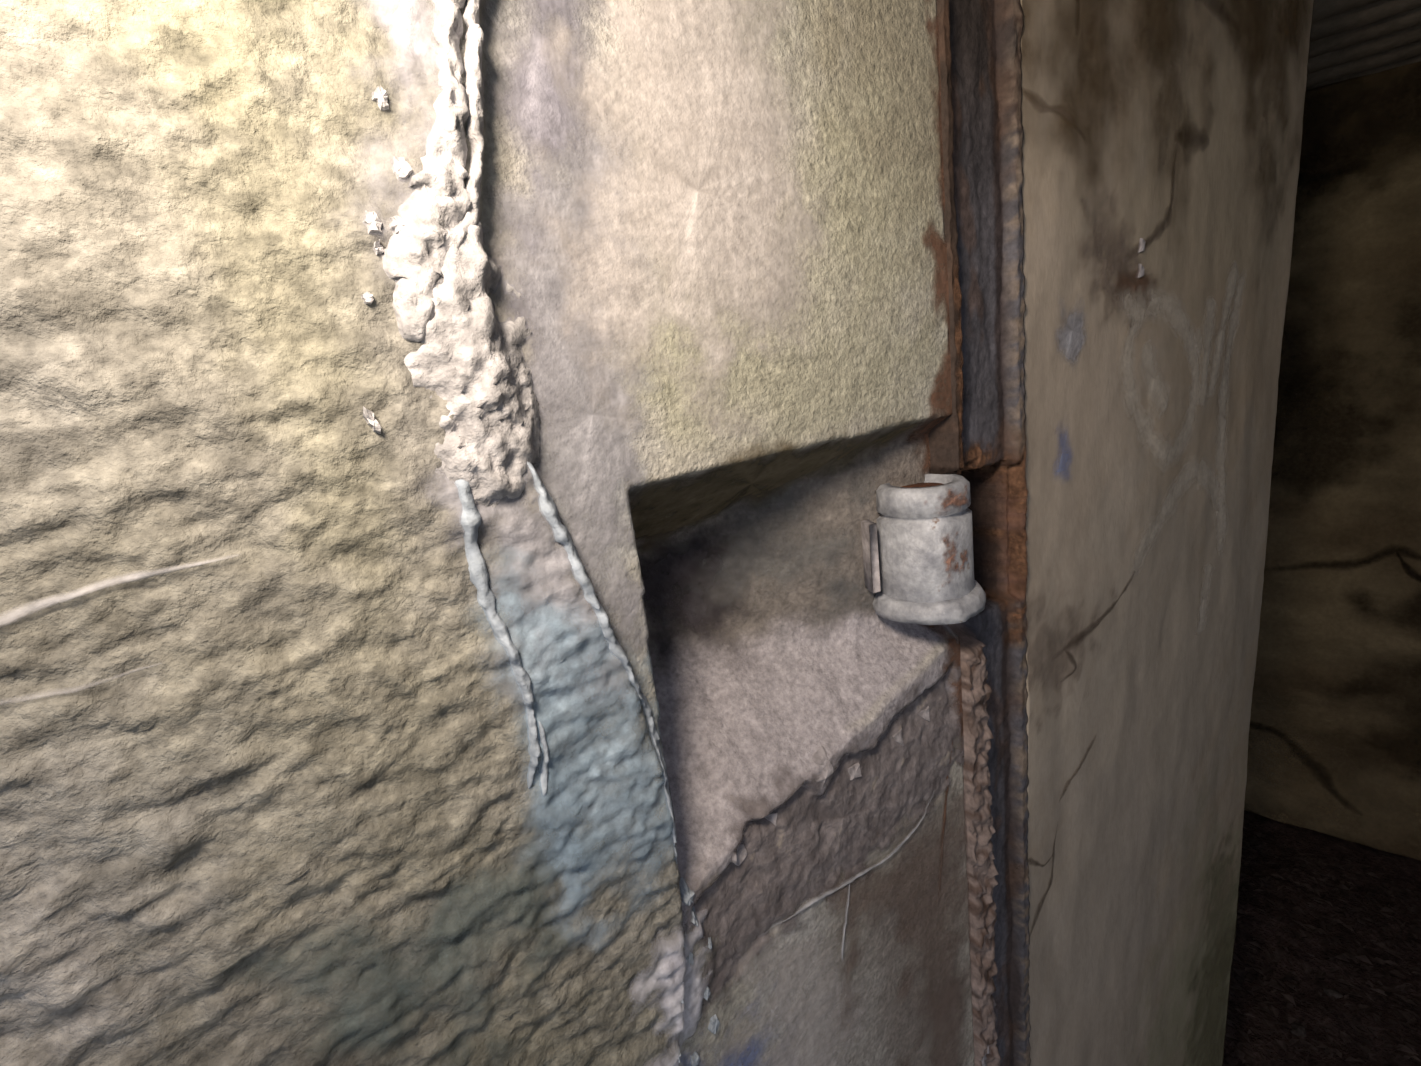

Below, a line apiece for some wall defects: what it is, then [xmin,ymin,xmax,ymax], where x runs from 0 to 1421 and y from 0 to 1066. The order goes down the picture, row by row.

corrosion [927,19,945,207]
crack [1131,130,1207,255]
damp [361,291,374,305]
corrosion [909,227,1028,511]
crack [0,560,217,625]
damp [363,0,853,1066]
corrosion [943,529,1028,643]
crack [1301,548,1421,582]
spalling [691,668,964,1014]
corrosion [924,625,964,890]